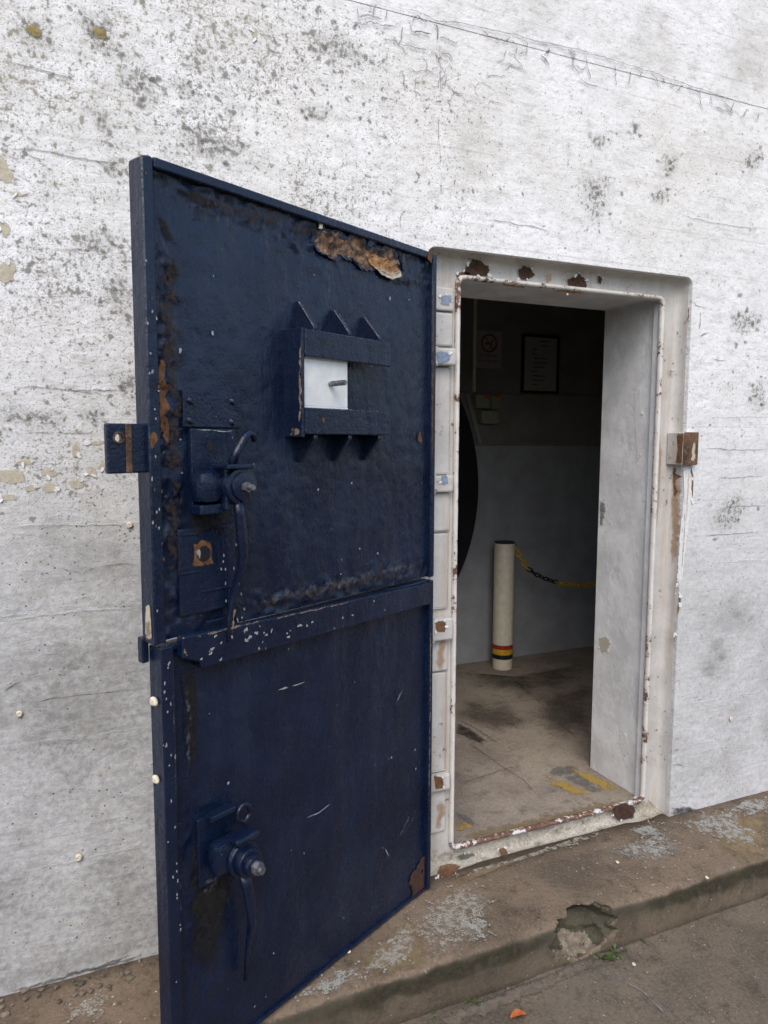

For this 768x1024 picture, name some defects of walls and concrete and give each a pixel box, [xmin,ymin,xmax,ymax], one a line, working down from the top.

crack [354,6,759,137]
peeling [310,229,406,281]
peeling [0,441,105,503]
corrosion [150,258,213,578]
corrosion [672,432,699,551]
corrosion [611,803,636,822]
corrosion [409,857,460,898]
peeling [294,832,616,998]